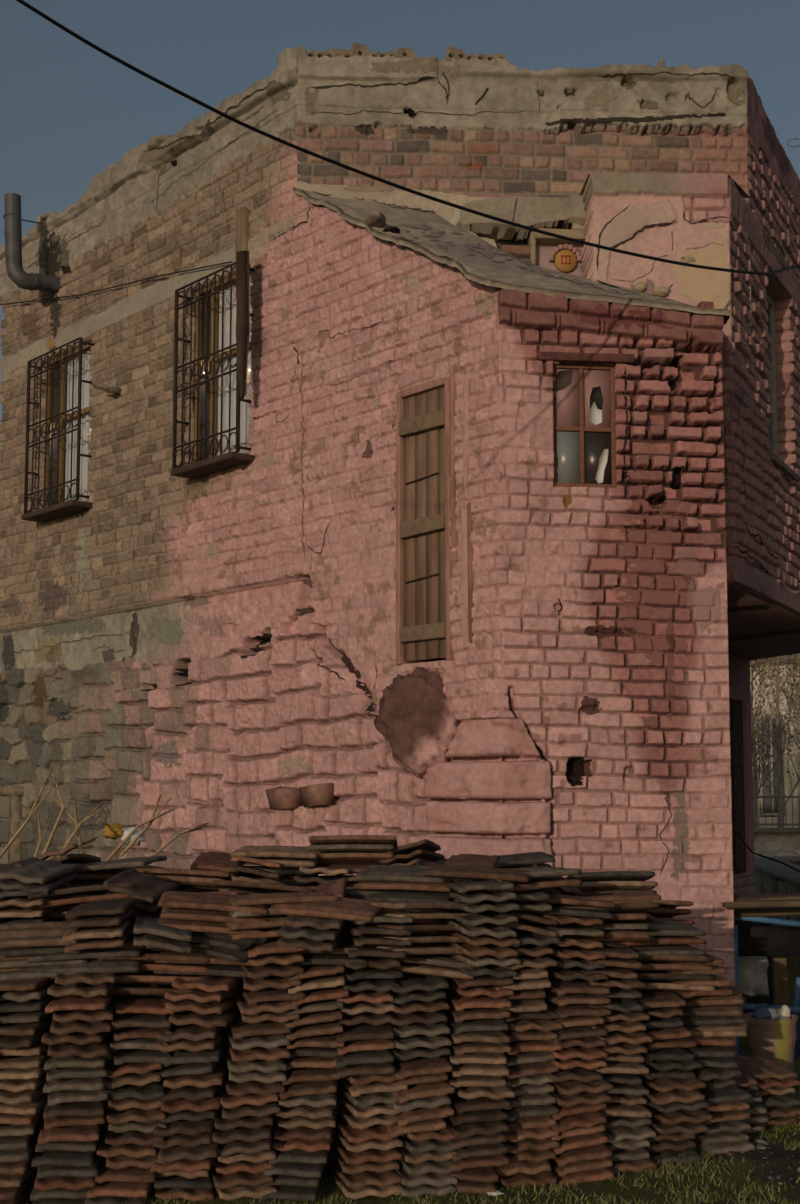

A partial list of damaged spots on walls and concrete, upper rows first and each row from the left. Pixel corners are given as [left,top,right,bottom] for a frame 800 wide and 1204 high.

crack [307,72,540,117]
crack [597,71,734,108]
crack [521,205,728,289]
spalling [295,575,315,617]
crack [310,639,378,725]
crack [508,687,517,718]
peeling [155,741,180,768]
crack [535,744,552,772]